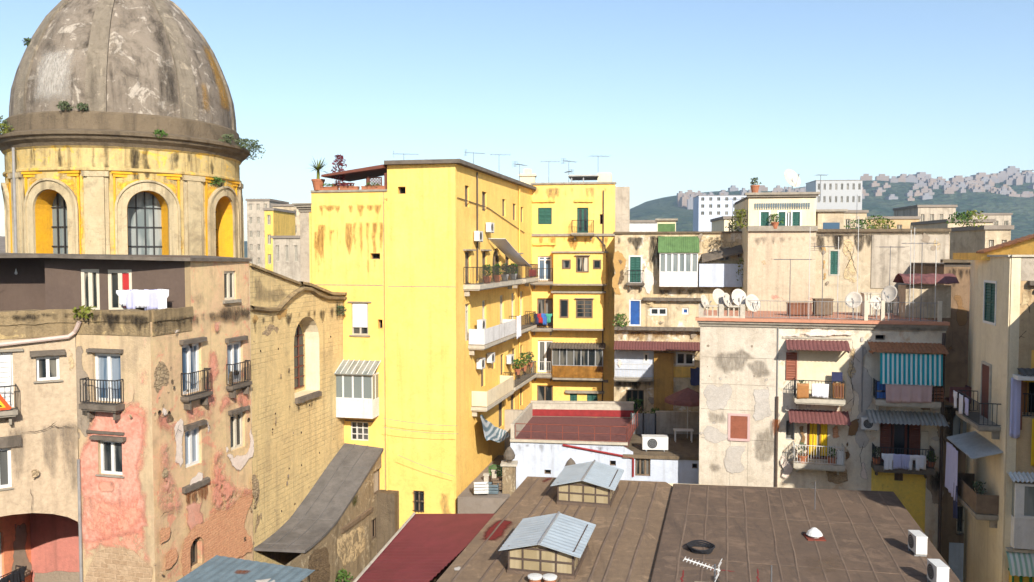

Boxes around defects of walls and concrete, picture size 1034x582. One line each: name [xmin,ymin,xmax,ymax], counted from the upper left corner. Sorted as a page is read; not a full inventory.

water stain [108,316,159,327]
flaking render [85,430,262,582]